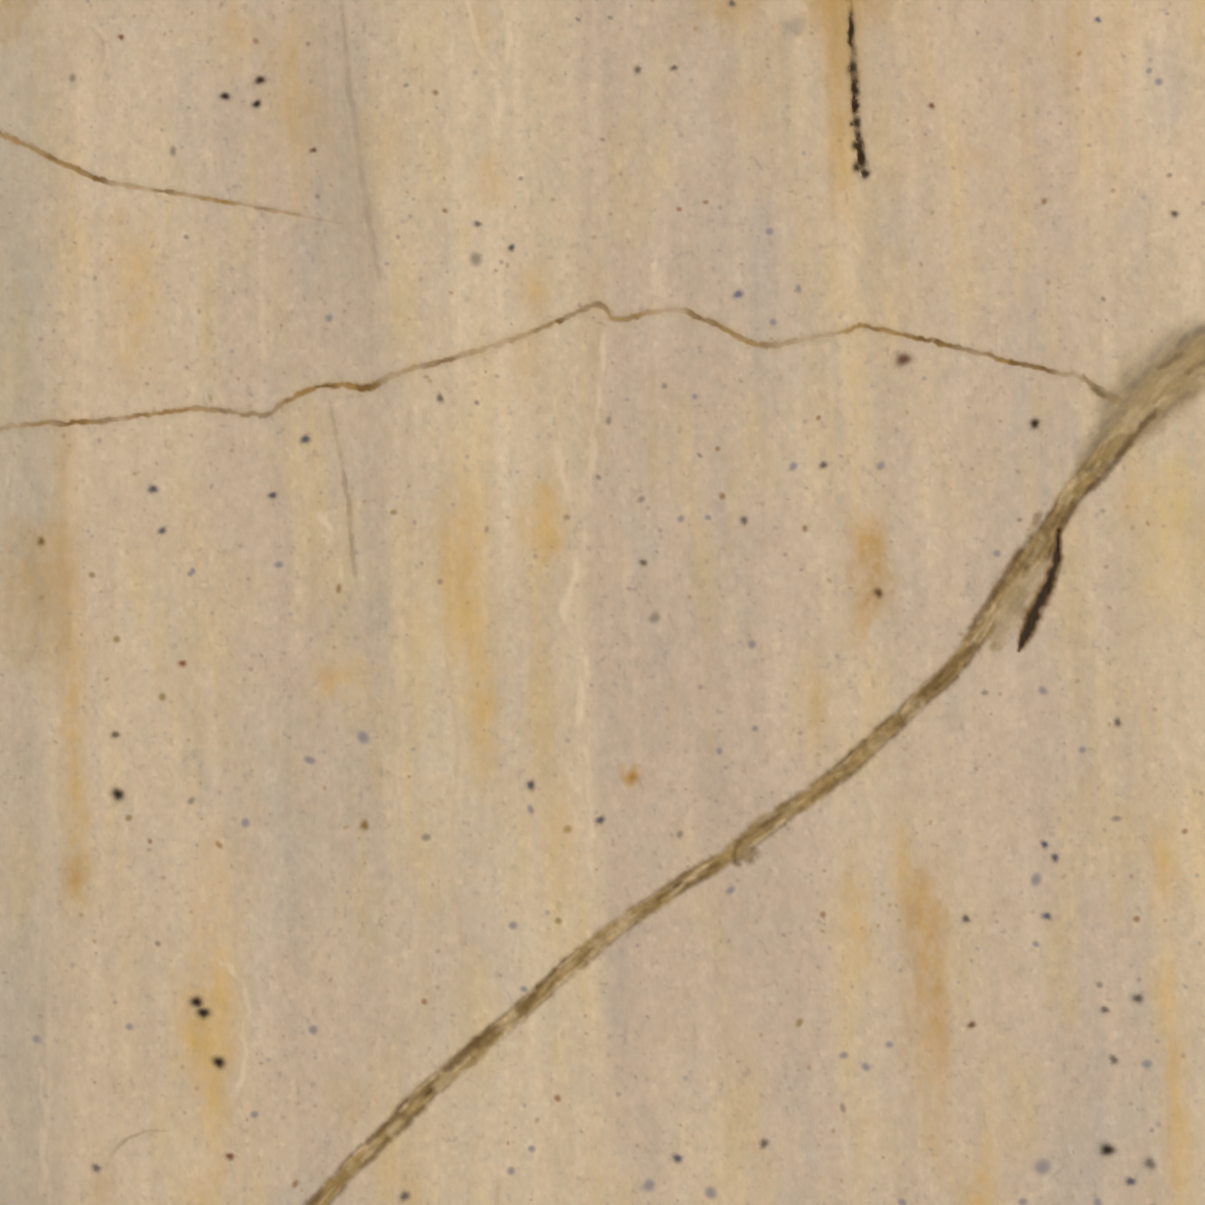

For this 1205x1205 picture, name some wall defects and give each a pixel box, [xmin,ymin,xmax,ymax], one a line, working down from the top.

crack [0,0,386,288]
crack [838,0,876,183]
crack [0,294,1205,1205]